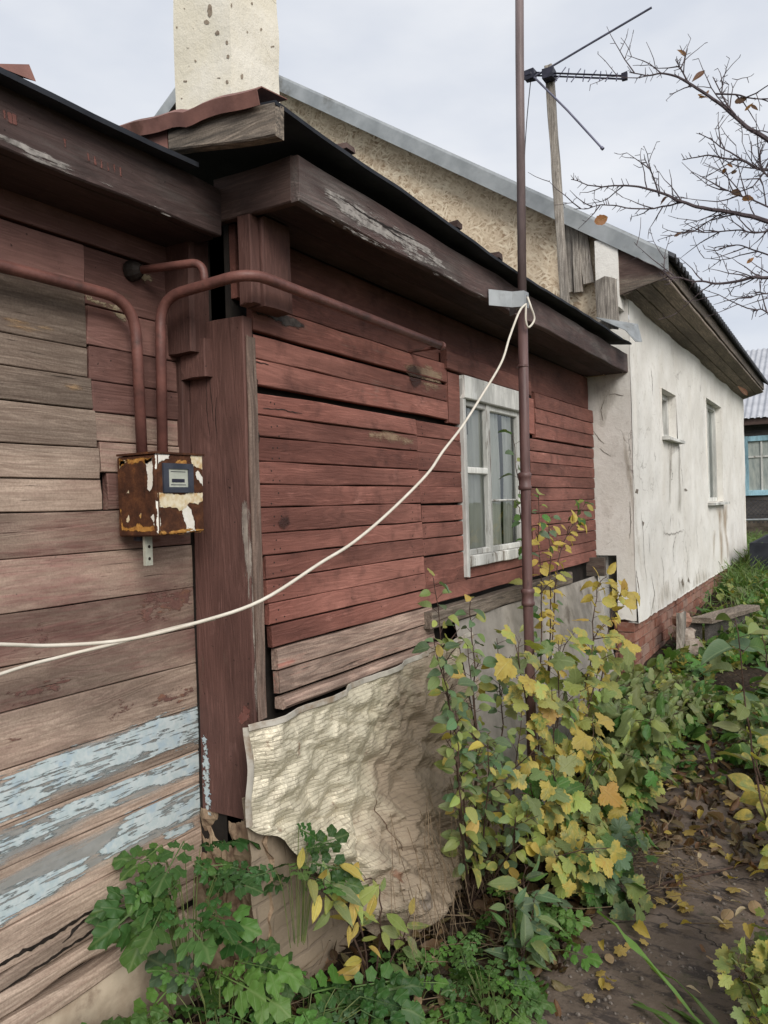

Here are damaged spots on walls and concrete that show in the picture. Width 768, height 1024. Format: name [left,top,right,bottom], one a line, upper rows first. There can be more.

peeling [325,189,460,284]
peeling [0,686,211,928]
crack [0,910,94,993]